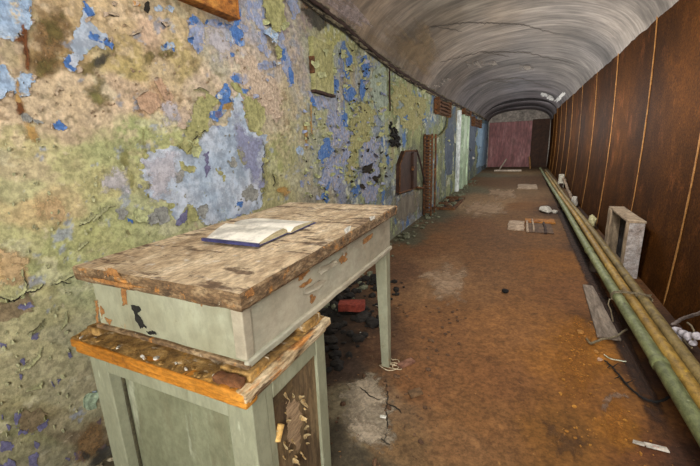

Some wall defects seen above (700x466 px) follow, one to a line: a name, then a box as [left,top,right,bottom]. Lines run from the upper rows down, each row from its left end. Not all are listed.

peeling [0,0,41,42]
peeling [63,0,126,73]
crack [302,0,573,121]
peeling [115,0,300,226]
peeling [296,41,450,203]
peeling [444,117,454,175]
peeling [469,124,488,169]
peeling [0,247,31,286]
crack [360,384,401,445]